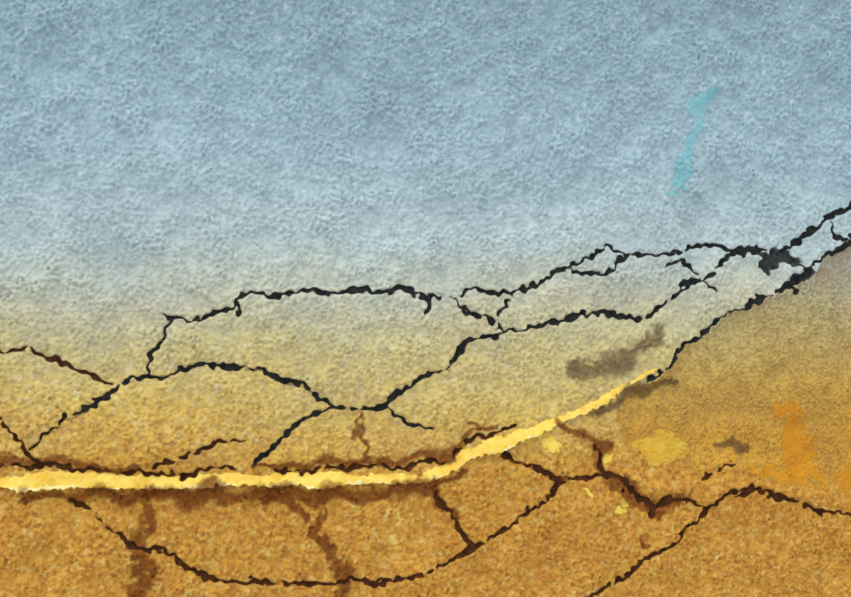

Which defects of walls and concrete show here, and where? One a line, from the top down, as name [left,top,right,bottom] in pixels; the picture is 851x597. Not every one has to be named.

rust [251,412,498,471]
crack [0,201,851,597]
rust [21,469,467,597]